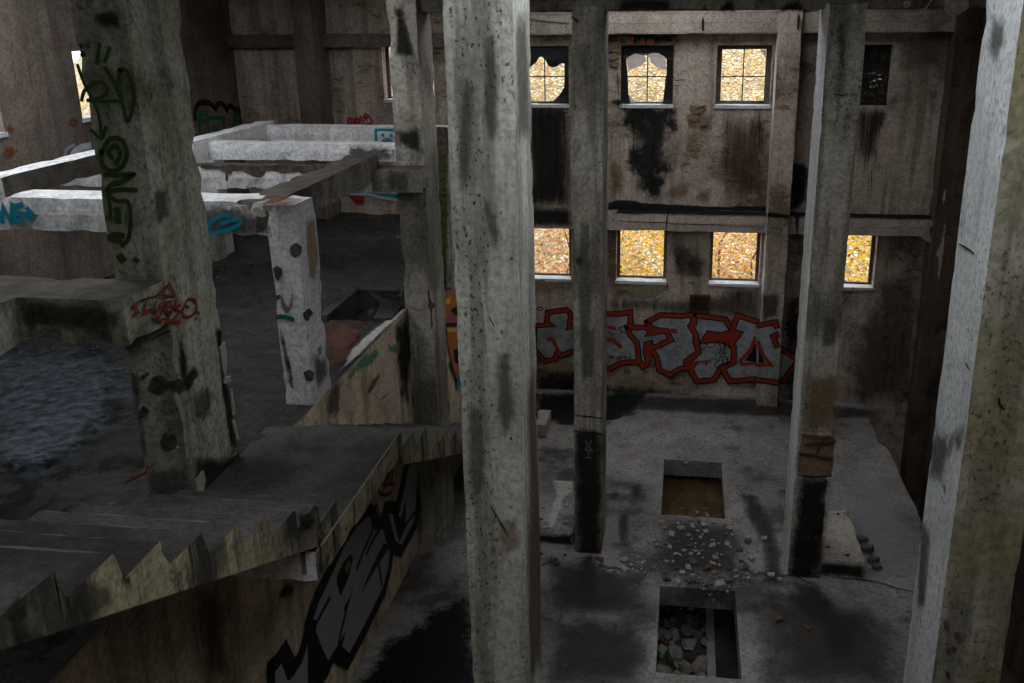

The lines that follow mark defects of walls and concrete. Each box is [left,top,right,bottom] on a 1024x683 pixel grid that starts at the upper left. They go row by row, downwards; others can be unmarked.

damp [529,226,593,671]